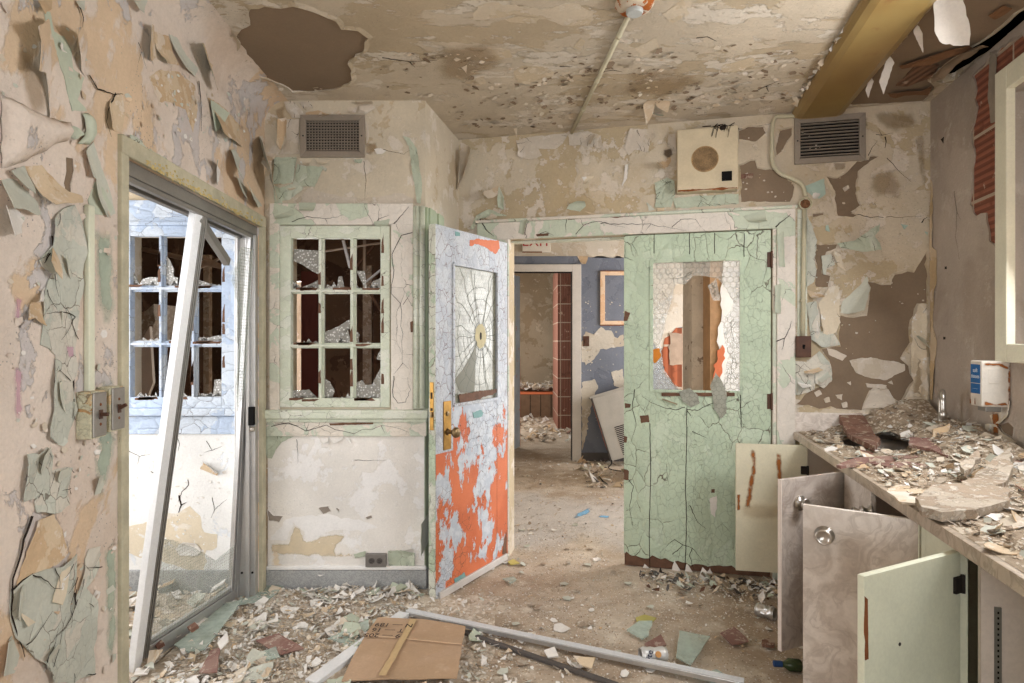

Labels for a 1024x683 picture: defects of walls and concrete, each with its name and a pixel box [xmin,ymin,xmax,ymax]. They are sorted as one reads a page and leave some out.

flaking render [109,0,422,219]
flaking render [849,0,1024,247]
flaking render [395,19,937,412]
peeling [2,0,147,683]
peeling [161,438,233,570]
peeling [266,436,294,459]
peeling [267,505,377,541]
crack [455,269,496,395]
peeling [581,302,624,449]
crack [525,219,742,567]
rust [737,451,756,510]